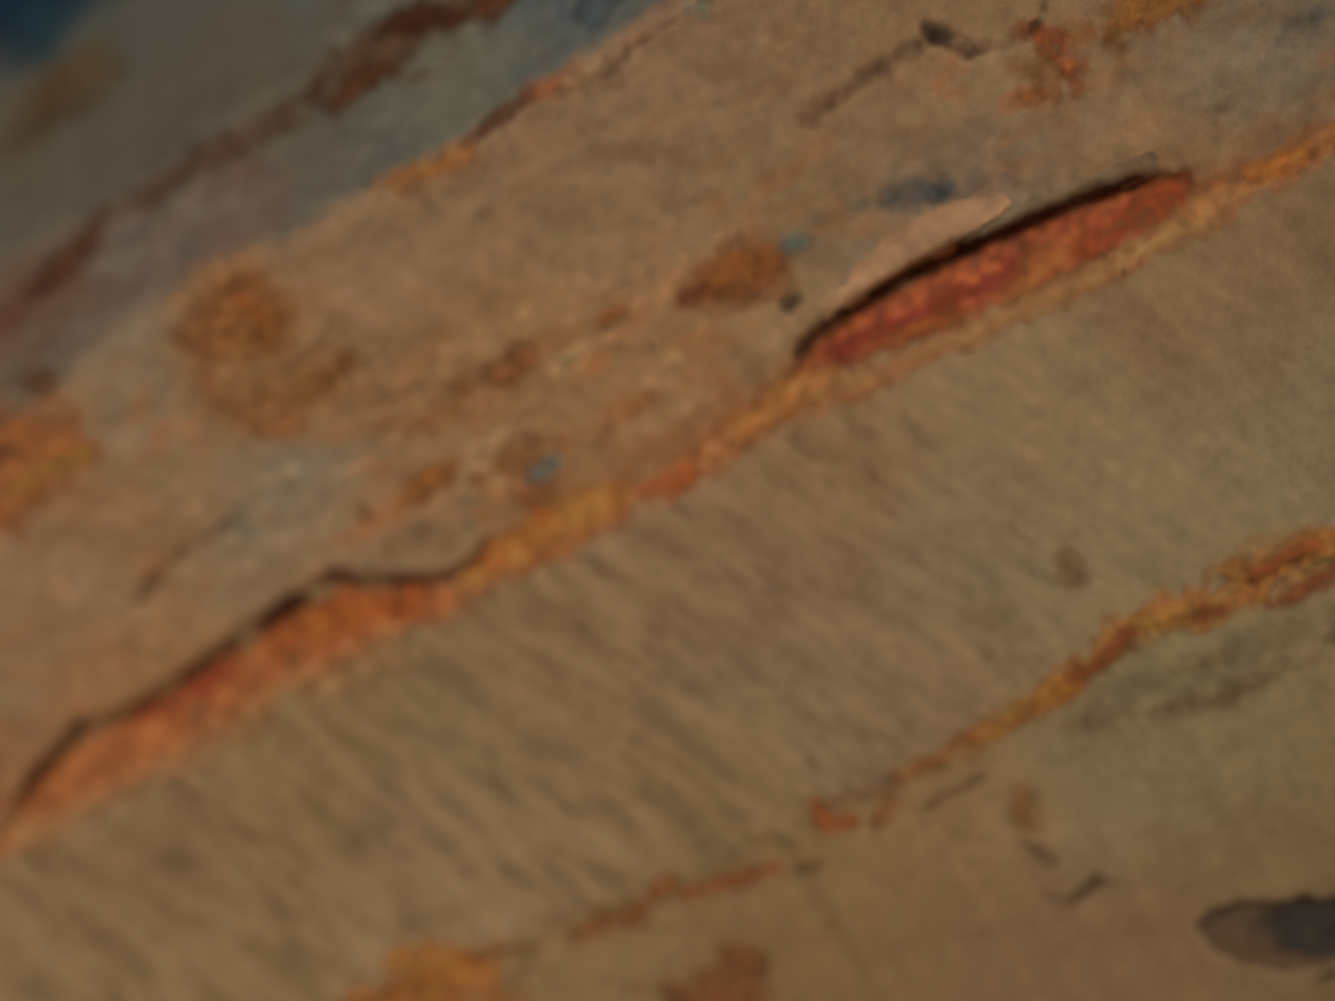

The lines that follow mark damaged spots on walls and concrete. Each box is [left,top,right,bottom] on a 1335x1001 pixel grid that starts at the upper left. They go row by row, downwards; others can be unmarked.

rust [1019,22,1079,102]
rust [698,244,799,311]
peeling [796,151,1187,370]
rust [967,529,1335,743]
peeling [1199,895,1335,979]